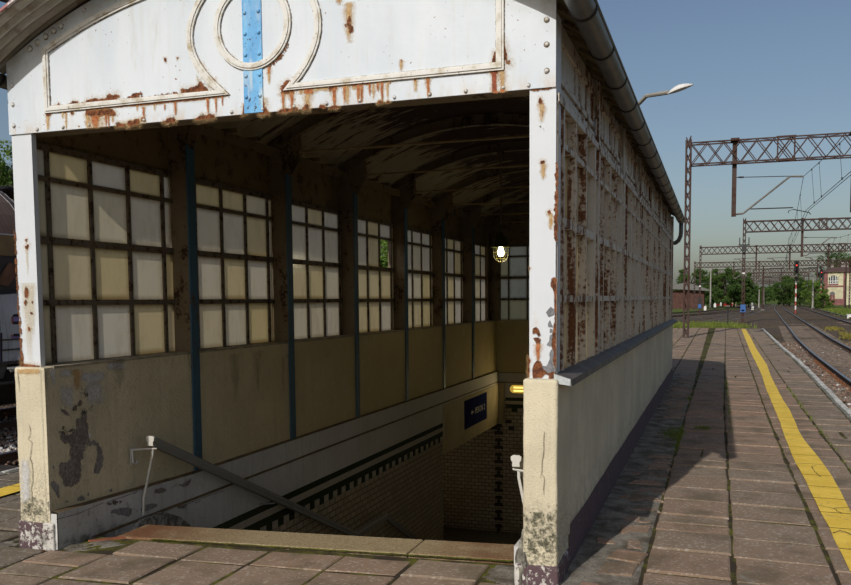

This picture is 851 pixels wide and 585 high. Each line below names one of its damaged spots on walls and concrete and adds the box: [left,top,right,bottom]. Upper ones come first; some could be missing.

rust [338,0,354,34]
rust [489,46,510,93]
rust [57,81,224,128]
rust [14,232,39,373]
peeling [532,277,557,379]
spalling [50,387,104,502]
crack [538,431,546,495]